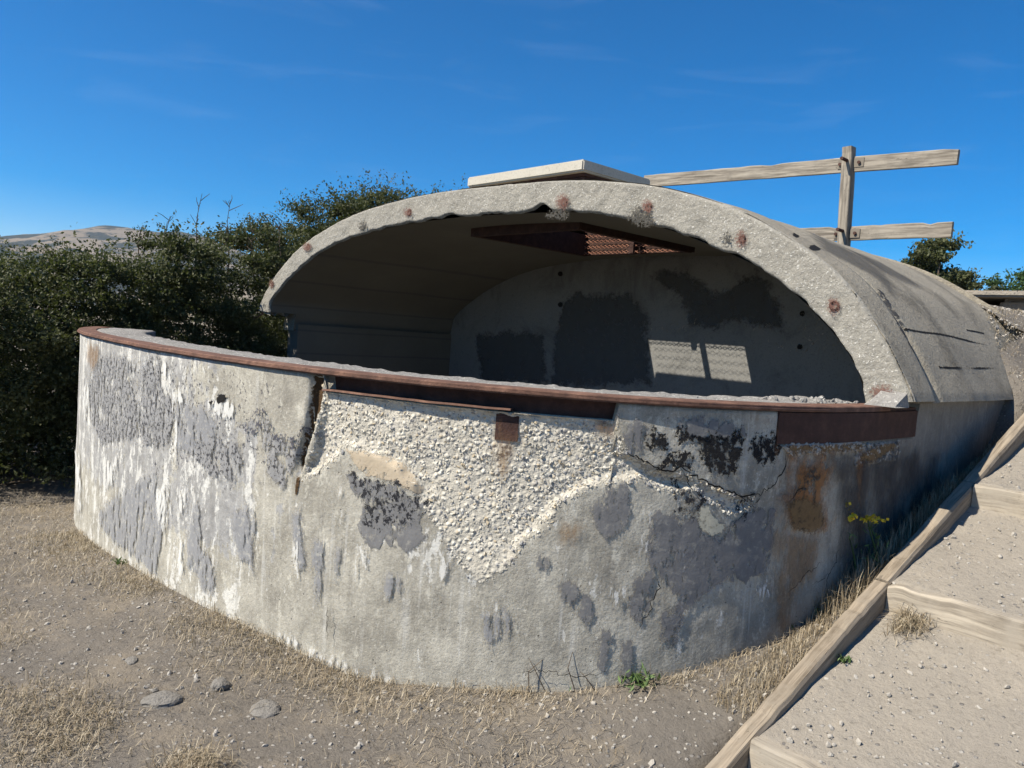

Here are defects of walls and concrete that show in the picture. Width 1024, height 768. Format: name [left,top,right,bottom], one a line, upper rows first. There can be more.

peeling [87,353,176,450]
spalling [208,399,234,419]
spalling [244,384,755,583]
crack [627,452,803,512]